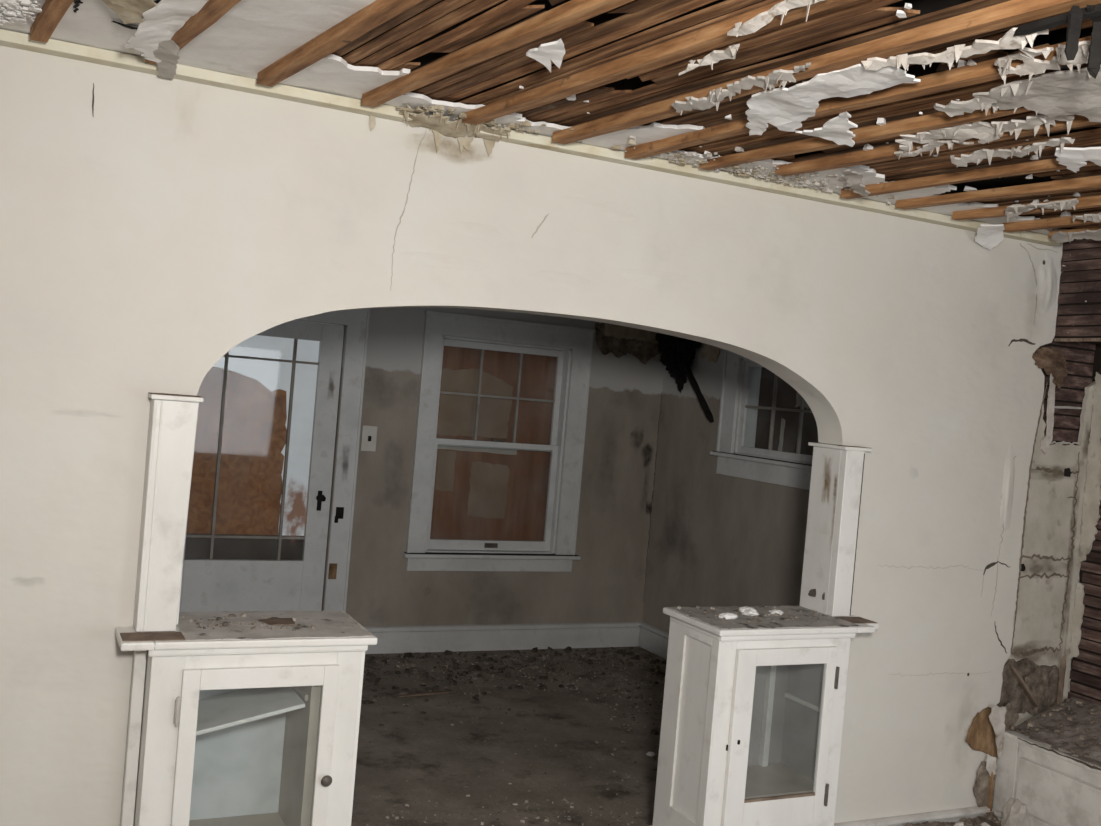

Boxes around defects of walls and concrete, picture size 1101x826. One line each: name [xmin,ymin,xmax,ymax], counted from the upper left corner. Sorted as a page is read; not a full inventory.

spalling [0,0,42,25]
peeling [102,0,209,79]
peeling [526,38,565,73]
peeling [679,0,824,75]
spalling [396,102,546,133]
peeling [672,28,1101,173]
crack [391,132,426,285]
spalling [645,146,894,204]
peeling [975,198,1101,250]
spalling [595,323,662,365]
spalling [1035,336,1096,446]
spalling [973,655,1101,815]